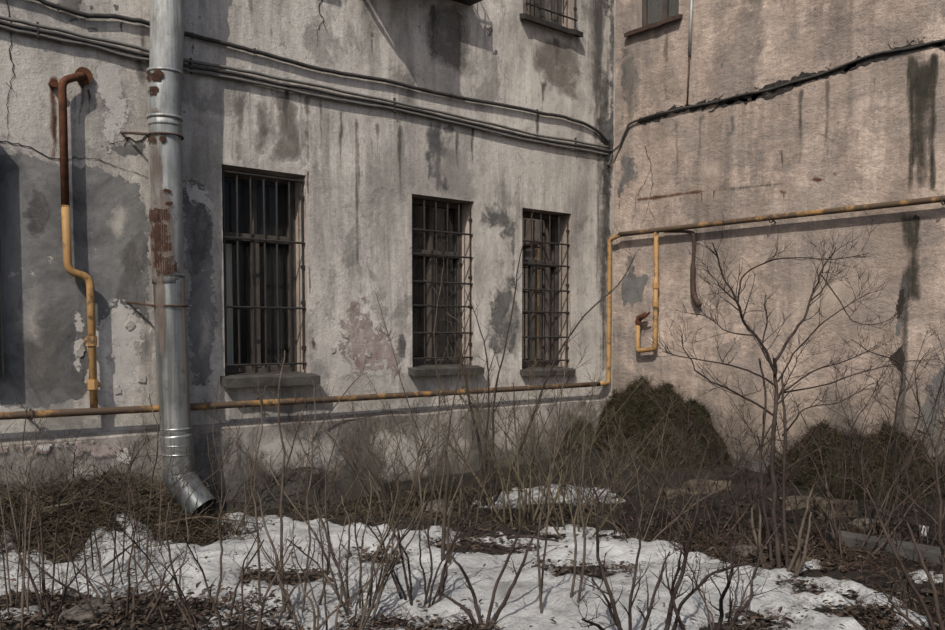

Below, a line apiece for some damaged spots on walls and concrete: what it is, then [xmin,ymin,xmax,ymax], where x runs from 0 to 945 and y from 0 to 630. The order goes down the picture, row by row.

crack [0,0,148,178]
crack [633,42,945,223]
damp [908,54,938,189]
peeling [73,311,85,372]
peeling [102,298,146,403]
peeling [330,297,406,381]
spalling [621,256,649,306]
damp [898,216,920,434]